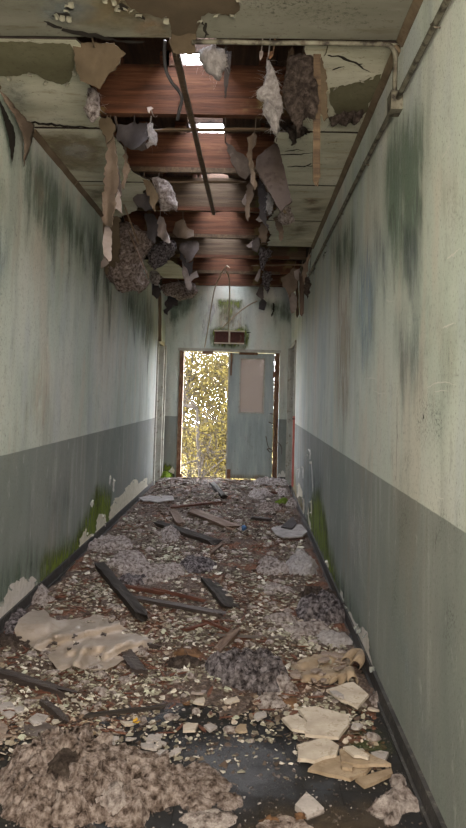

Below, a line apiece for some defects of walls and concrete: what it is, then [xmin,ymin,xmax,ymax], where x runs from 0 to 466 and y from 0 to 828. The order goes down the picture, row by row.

peeling [52,2,75,23]
peeling [102,0,145,20]
crack [327,55,369,72]
leakage [386,118,423,257]
leakage [28,159,109,294]
flaking render [79,475,148,547]
peeling [0,576,38,618]
peeling [340,591,375,673]